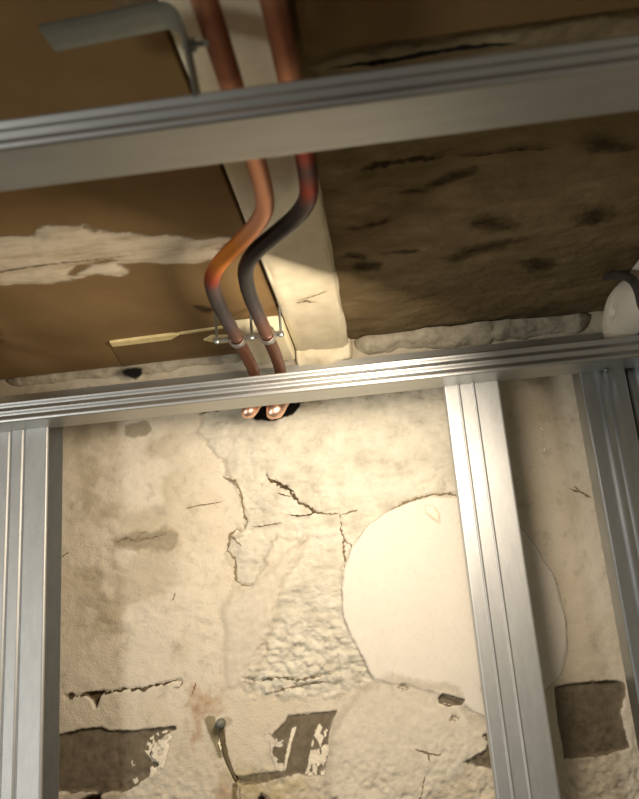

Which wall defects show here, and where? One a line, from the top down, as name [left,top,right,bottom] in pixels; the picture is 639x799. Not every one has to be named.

crack [328,43,517,69]
crack [186,474,357,586]
spalling [199,387,456,700]
crack [66,680,183,697]
crack [252,673,331,695]
spalling [438,694,465,721]
spalling [59,726,176,795]
spalling [236,711,337,785]
crack [415,749,441,799]